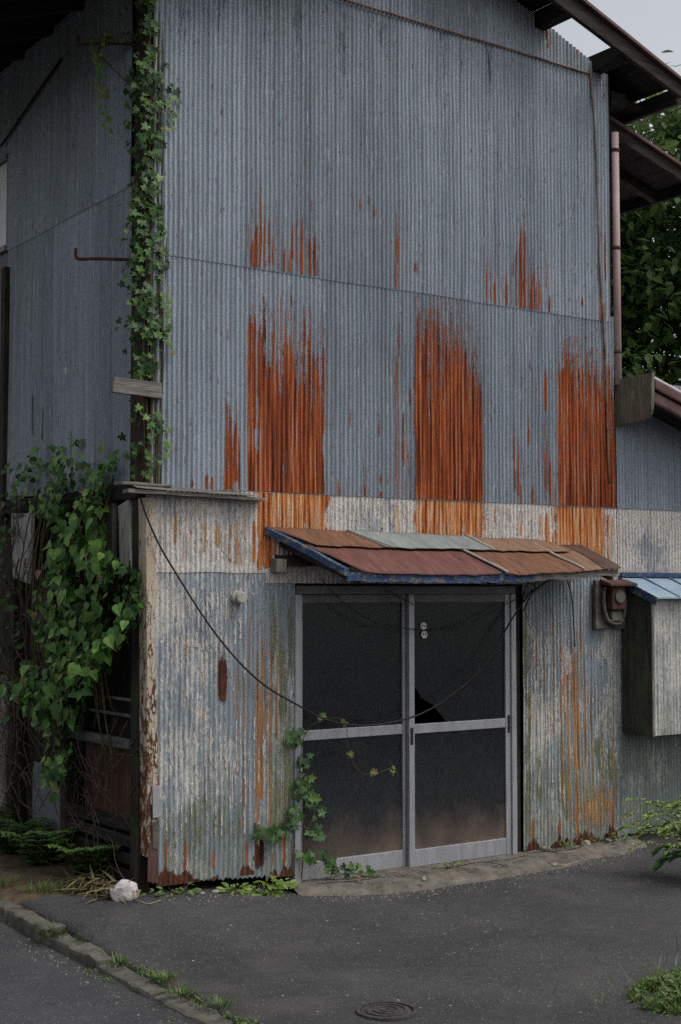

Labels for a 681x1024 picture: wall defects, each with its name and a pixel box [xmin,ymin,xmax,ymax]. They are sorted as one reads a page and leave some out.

rust [248,184,318,276]
rust [486,215,550,312]
rust [174,295,339,572]
rust [380,295,496,537]
rust [513,336,616,559]
rust [147,820,221,887]
peeling [147,585,264,837]
rust [218,611,293,879]
rust [524,592,618,851]